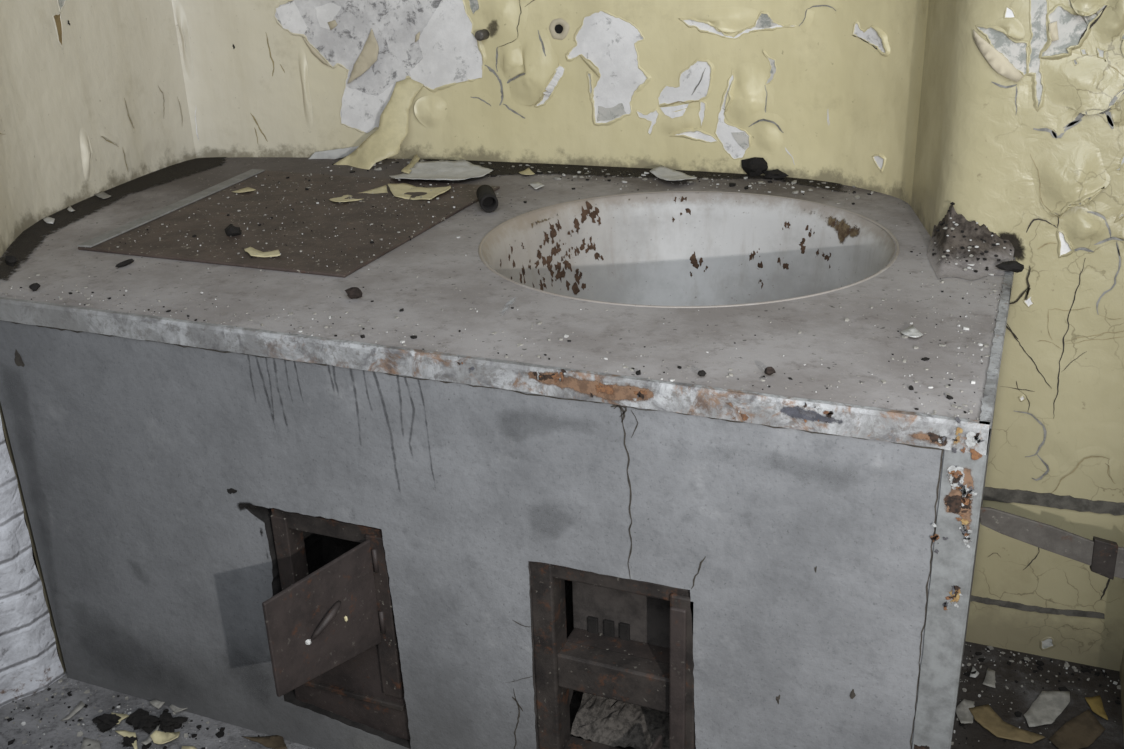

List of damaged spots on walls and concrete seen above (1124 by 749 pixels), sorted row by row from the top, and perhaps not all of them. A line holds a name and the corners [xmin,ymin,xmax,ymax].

peeling [274,0,487,169]
peeling [534,10,751,160]
peeling [973,0,1109,112]
peeling [329,154,493,202]
crack [986,64,1124,493]
damp [247,354,301,425]
damp [350,368,427,451]
rust [528,369,654,401]
crack [611,405,638,581]
rust [909,417,984,548]